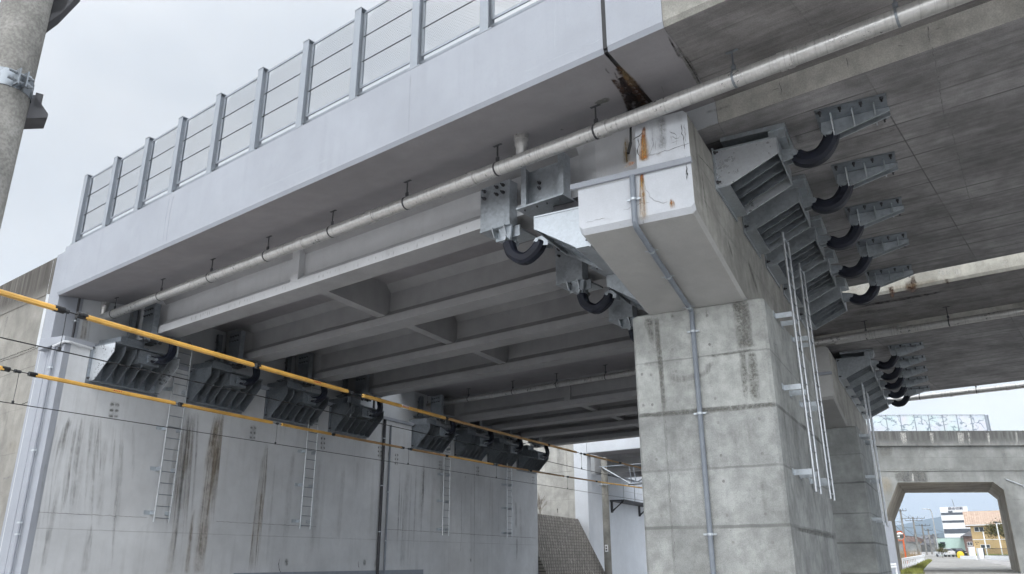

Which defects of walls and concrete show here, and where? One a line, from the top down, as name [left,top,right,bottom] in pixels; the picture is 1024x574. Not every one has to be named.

leakage [605,54,648,112]
rust [624,129,647,165]
crack [633,125,713,178]
leakage [646,320,664,399]
leakage [733,302,757,397]